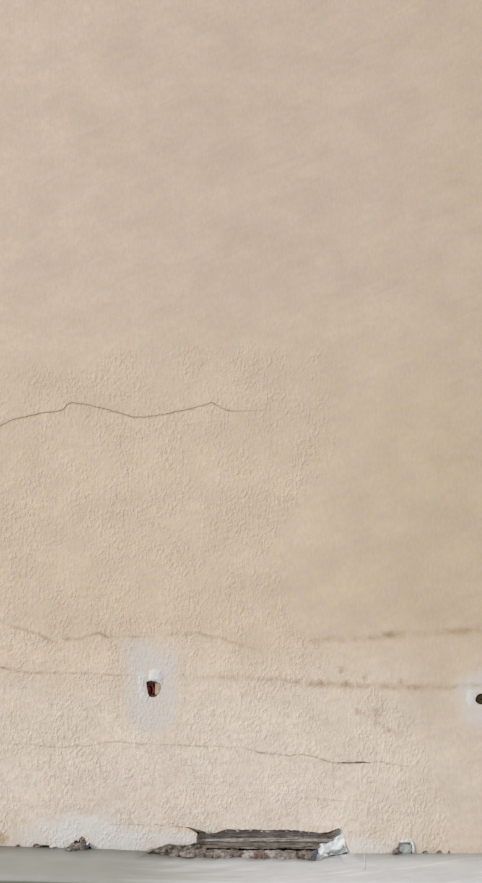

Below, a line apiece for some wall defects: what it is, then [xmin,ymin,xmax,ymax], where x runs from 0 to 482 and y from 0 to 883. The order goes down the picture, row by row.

flaking render [147,827,347,861]